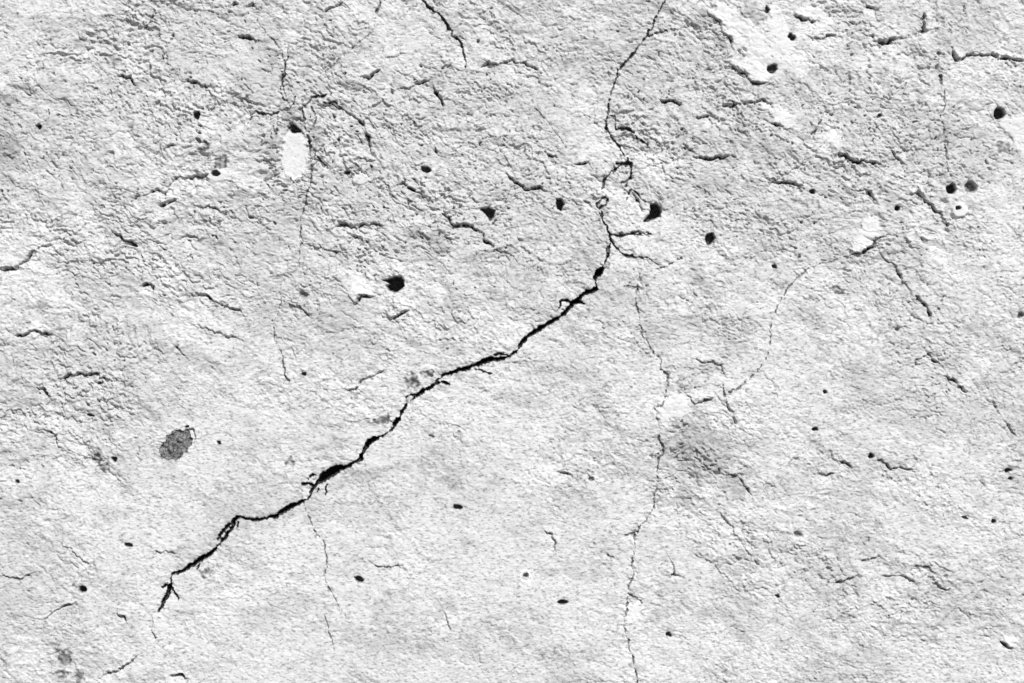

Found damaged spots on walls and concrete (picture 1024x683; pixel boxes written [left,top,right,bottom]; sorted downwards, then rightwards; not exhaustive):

crack [158,0,683,683]